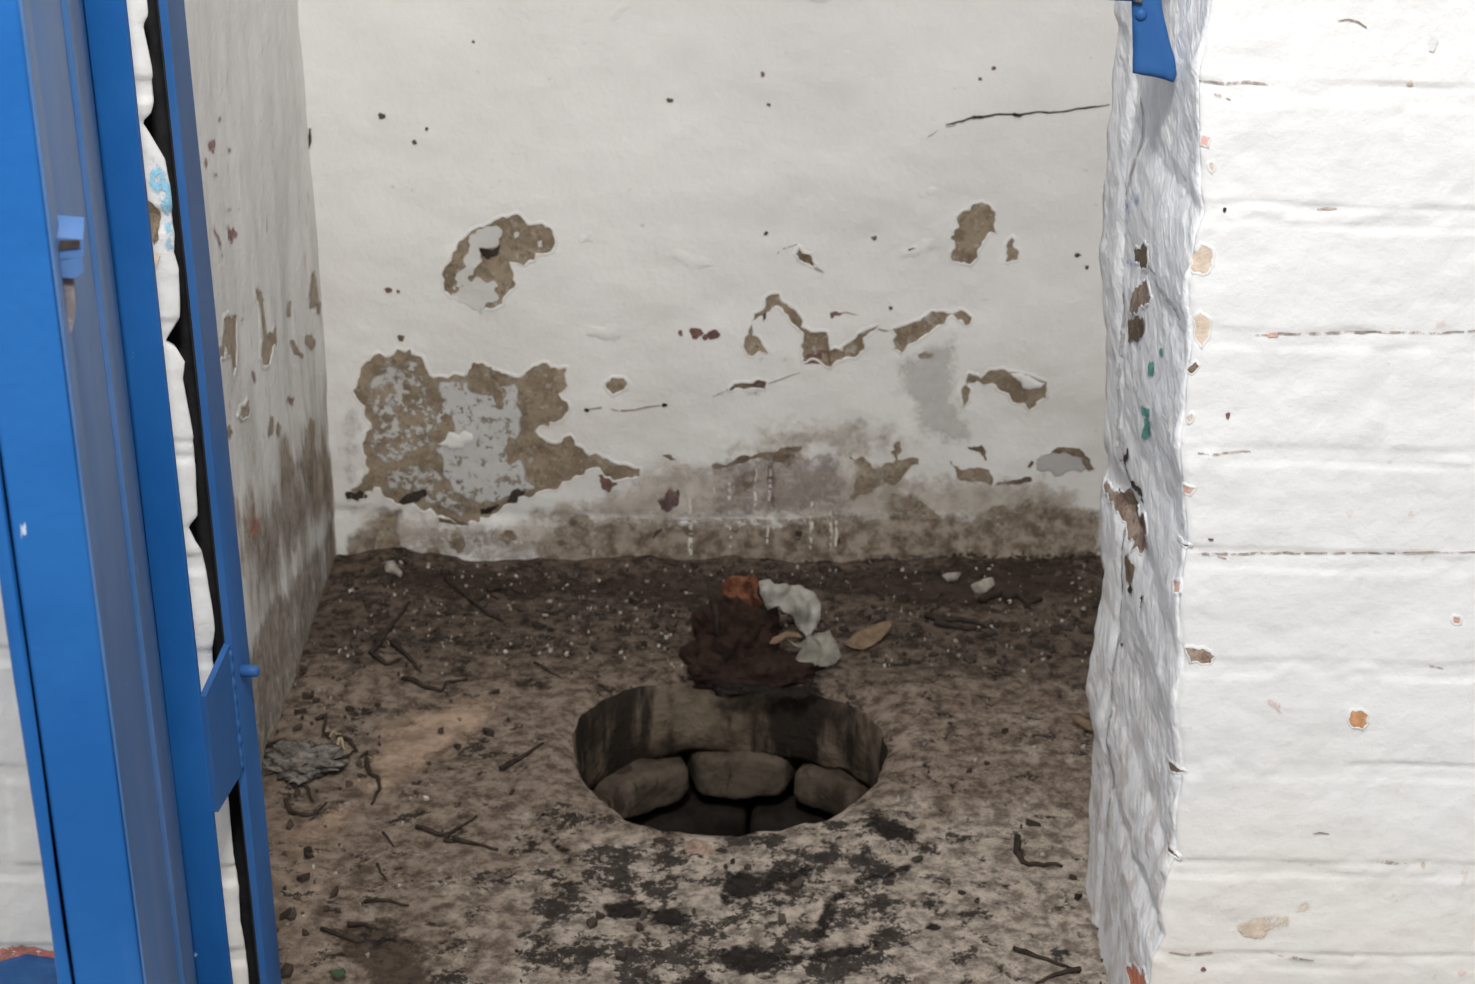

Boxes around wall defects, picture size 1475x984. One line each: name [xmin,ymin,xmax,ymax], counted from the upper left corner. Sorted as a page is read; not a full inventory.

crack [928,78,1143,193]
peeling [438,211,558,315]
peeling [947,200,1022,267]
peeling [345,335,643,528]
peeling [713,291,974,397]
crack [1116,293,1131,483]
leakage [249,429,335,610]
leakage [348,510,401,555]
leakage [804,501,838,562]
leakage [850,551,1096,563]
spalling [950,445,1149,608]
crack [1104,529,1125,866]